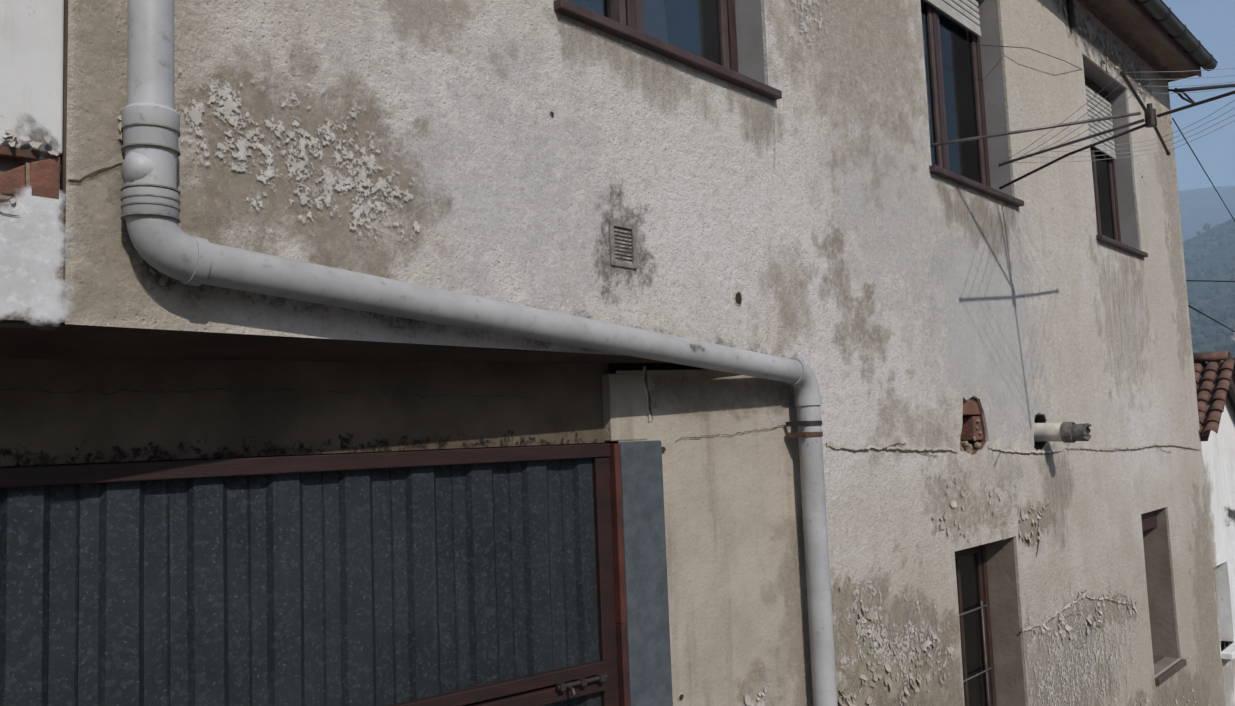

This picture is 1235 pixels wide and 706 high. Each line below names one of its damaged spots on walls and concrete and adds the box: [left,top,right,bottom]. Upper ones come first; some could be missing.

water stain [177,64,425,277]
water stain [0,430,597,467]
crack [676,425,798,441]
crack [826,441,958,457]
spalling [960,396,986,455]
crack [988,443,1201,465]
peeling [1034,593,1139,643]
peeling [831,583,959,706]